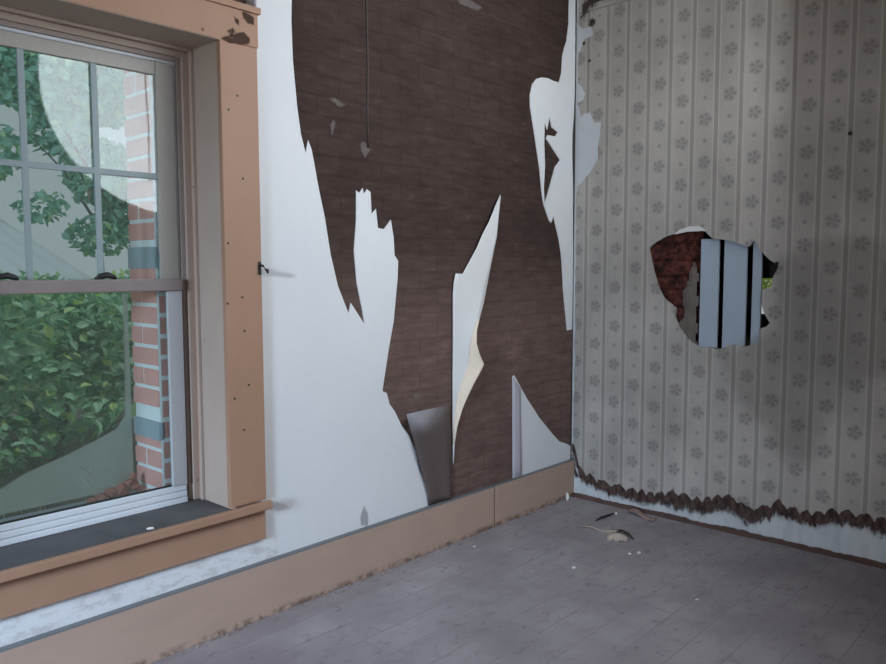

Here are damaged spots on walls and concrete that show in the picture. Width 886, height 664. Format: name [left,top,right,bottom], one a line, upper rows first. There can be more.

peeling [222,0,256,45]
peeling [576,104,601,187]
flaking render [291,0,572,498]
spalling [650,226,778,349]